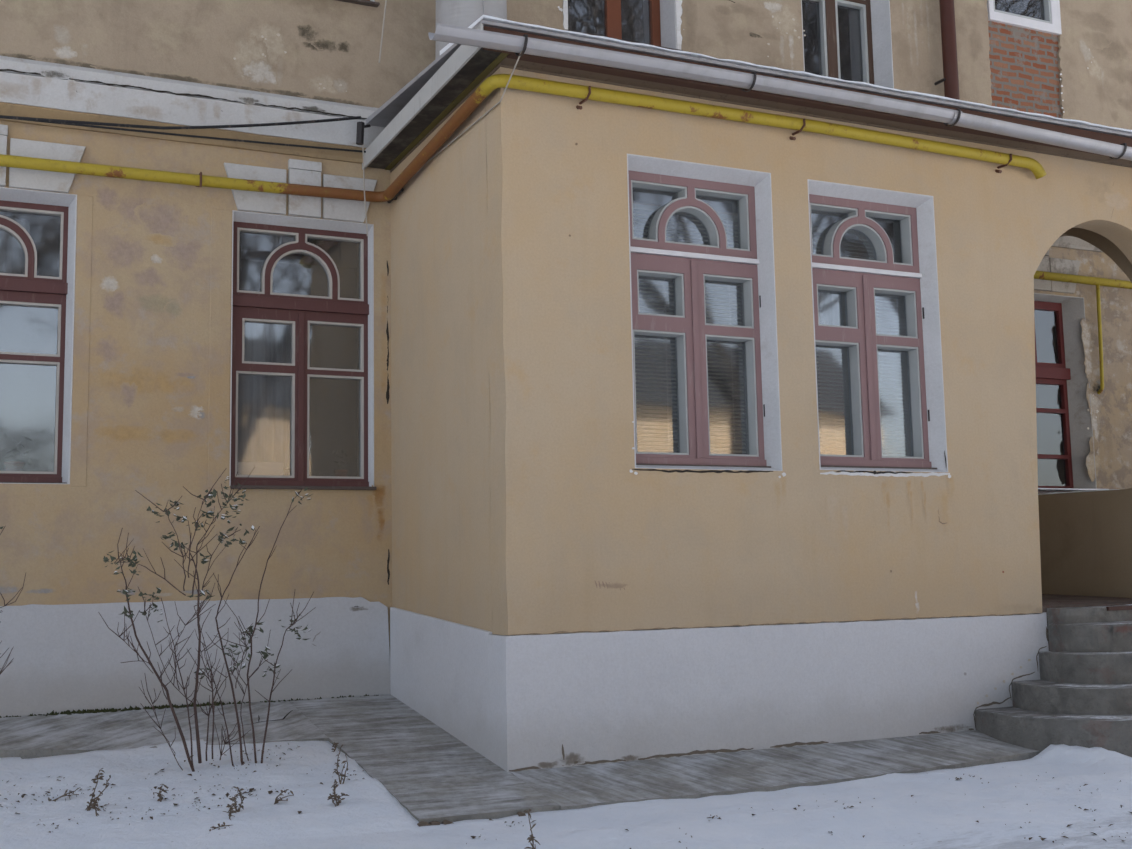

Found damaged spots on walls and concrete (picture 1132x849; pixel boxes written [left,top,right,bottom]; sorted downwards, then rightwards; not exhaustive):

peeling [231,23,287,89]
water stain [294,24,351,75]
flaking render [988,21,1062,118]
crack [384,261,392,404]
peeling [1080,318,1107,482]
crack [384,549,392,585]